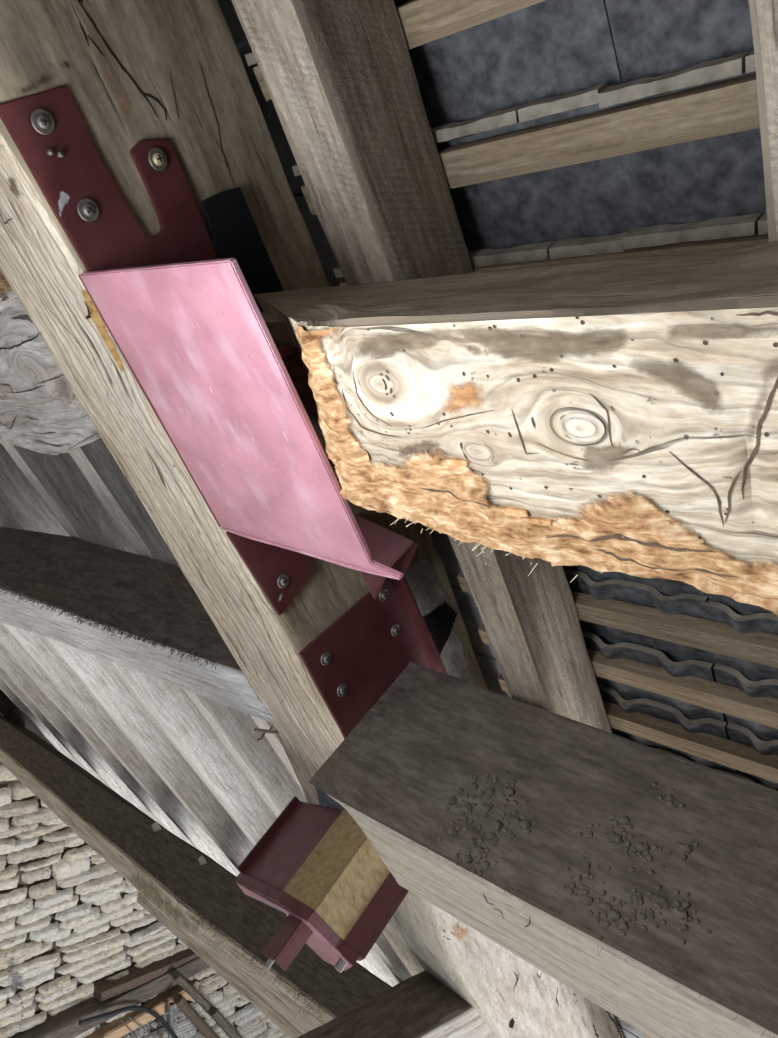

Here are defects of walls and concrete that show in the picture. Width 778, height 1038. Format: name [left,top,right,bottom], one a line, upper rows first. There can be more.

crack [77,0,179,122]
crack [197,59,236,188]
crack [0,268,92,363]
crack [1,375,62,430]
crack [421,488,490,508]
crack [589,393,642,454]
crack [670,377,778,526]
crack [546,534,739,578]